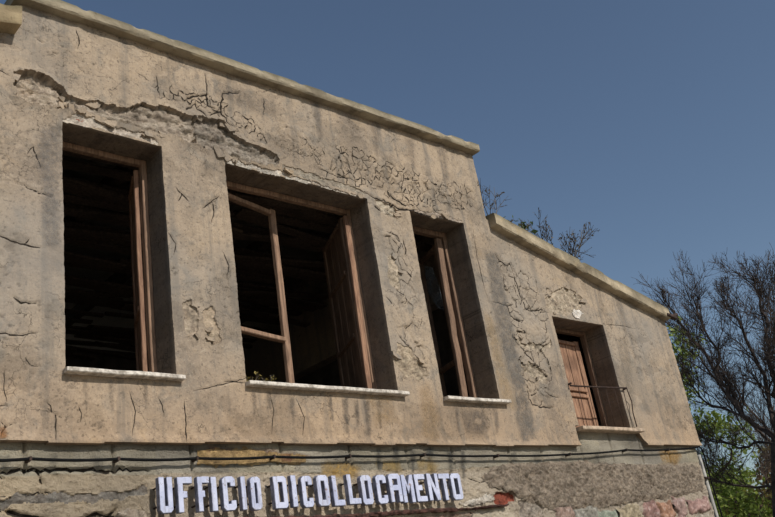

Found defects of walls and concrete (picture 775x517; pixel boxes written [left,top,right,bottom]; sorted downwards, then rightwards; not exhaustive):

spalling [13,70,365,199]
crack [0,236,40,248]
crack [138,73,472,368]
spalling [182,300,221,346]
crack [473,231,558,408]
crack [184,377,249,441]
spalling [0,485,150,517]